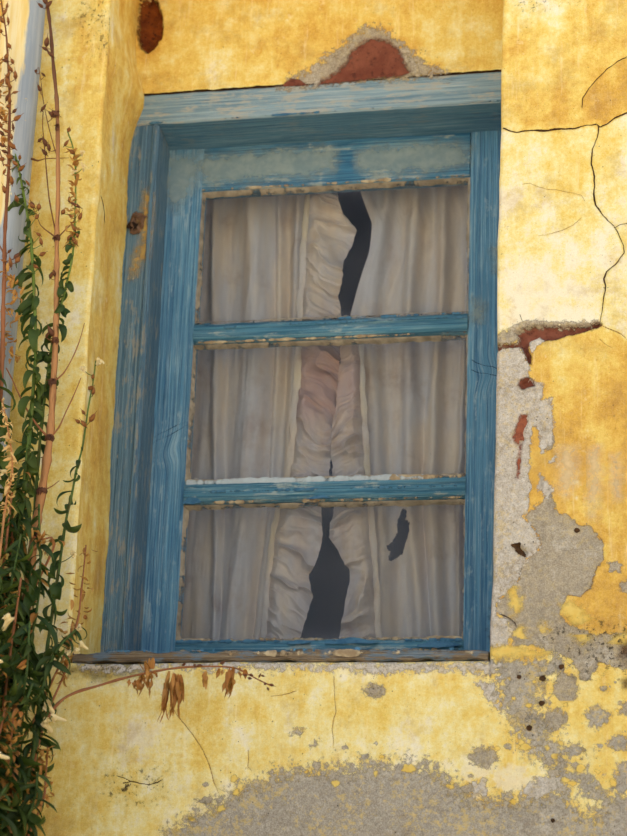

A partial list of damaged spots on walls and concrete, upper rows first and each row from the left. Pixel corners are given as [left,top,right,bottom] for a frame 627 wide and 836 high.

spalling [137,0,164,54]
spalling [275,22,448,92]
crack [582,57,626,105]
crack [503,112,627,348]
peeling [155,319,627,836]
peeling [77,663,145,675]